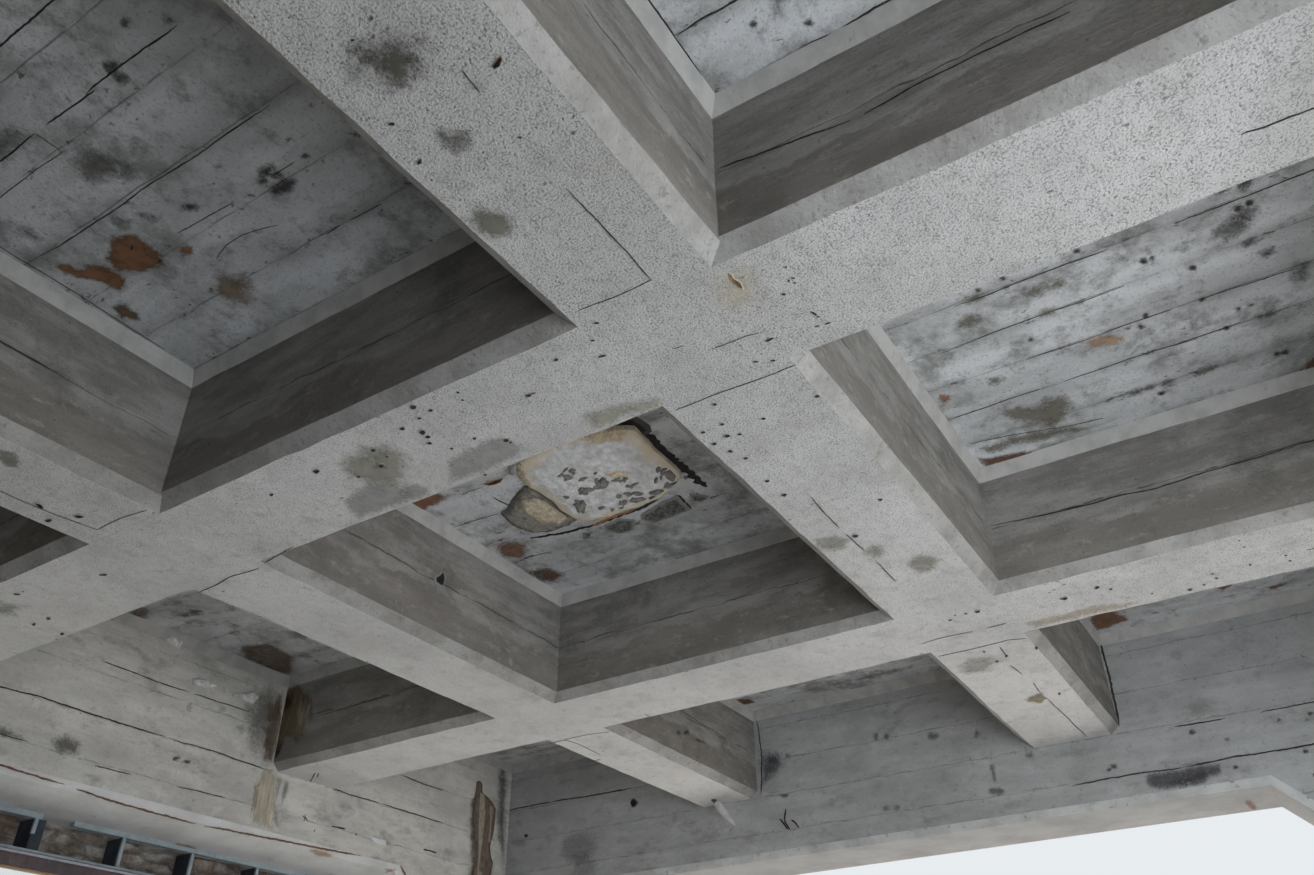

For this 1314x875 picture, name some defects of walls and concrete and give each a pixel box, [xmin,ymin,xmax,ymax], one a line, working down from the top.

water stain [347,38,423,92]
crack [0,25,177,198]
crack [1241,107,1314,135]
corrosion [57,234,165,321]
crack [0,105,277,350]
crack [566,188,651,311]
mould [1218,180,1272,256]
spalling [701,423,749,460]
water stain [345,448,427,516]
corrosion [413,494,443,510]
corrosion [1091,612,1127,630]
water stain [1148,766,1237,789]